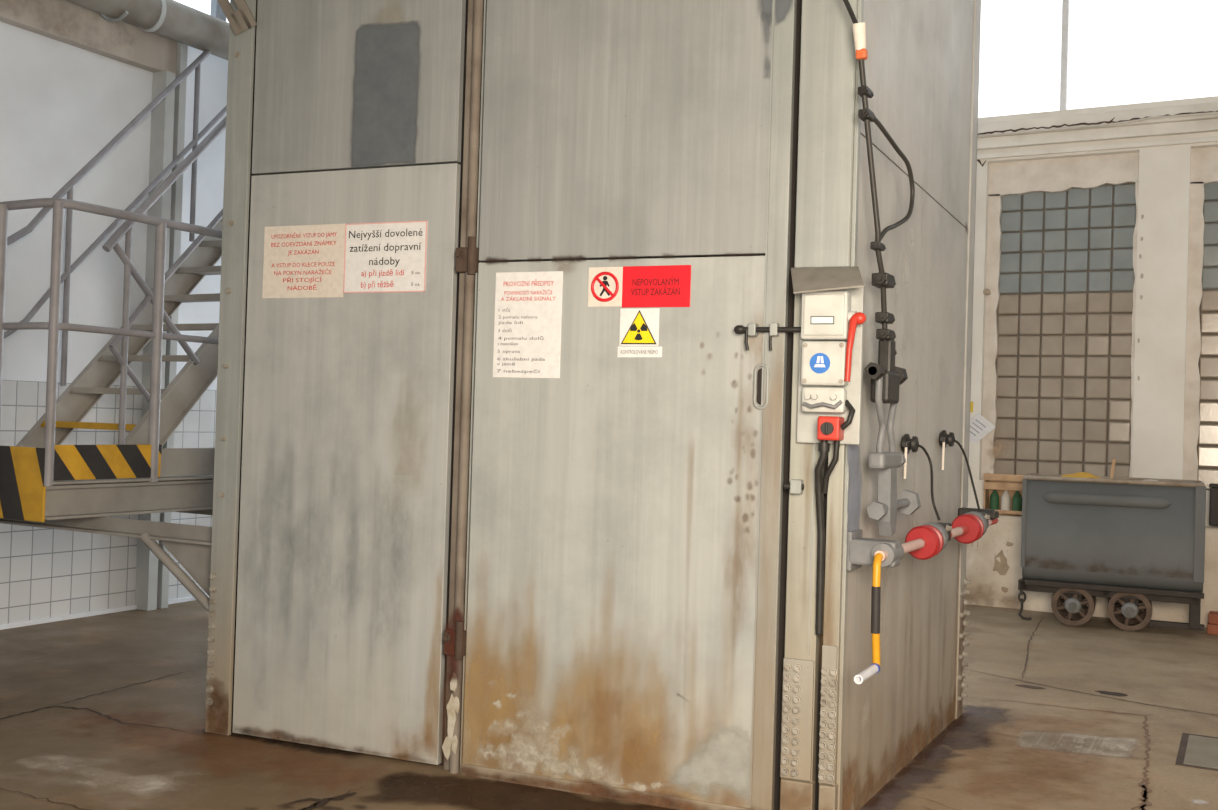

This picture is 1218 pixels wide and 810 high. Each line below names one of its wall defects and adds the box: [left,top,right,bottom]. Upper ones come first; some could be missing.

leakage [356,773,676,810]
rust [444,609,698,810]
rust [842,700,956,810]
leakage [860,705,1008,810]
crack [966,618,1214,810]